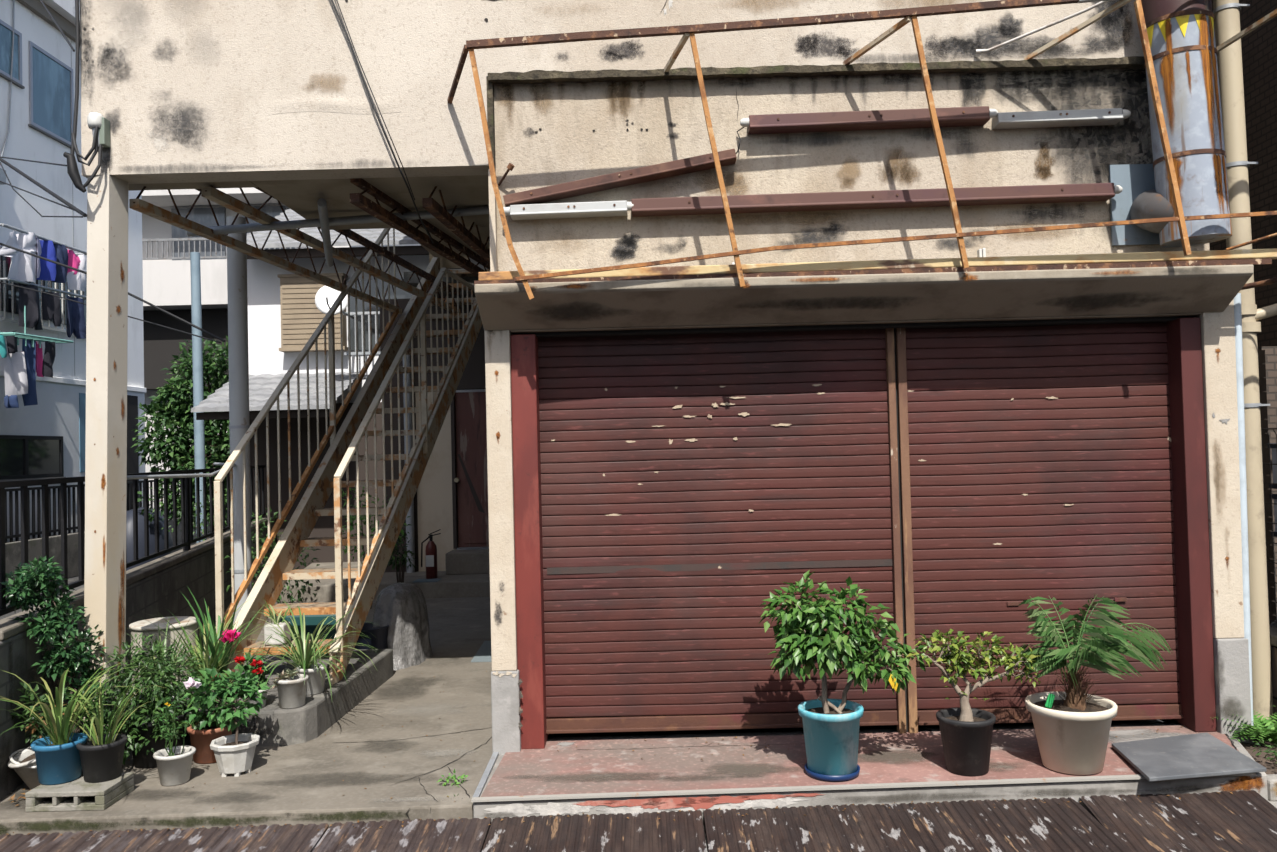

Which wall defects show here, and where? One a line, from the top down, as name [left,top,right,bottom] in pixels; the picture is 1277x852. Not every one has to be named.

water stain [80,34,124,78]
water stain [600,42,643,60]
water stain [796,34,867,60]
water stain [882,0,1153,183]
water stain [106,114,119,132]
water stain [159,108,203,142]
water stain [782,133,840,145]
corrosion [1160,14,1228,207]
water stain [611,235,639,260]
peeling [672,386,749,418]